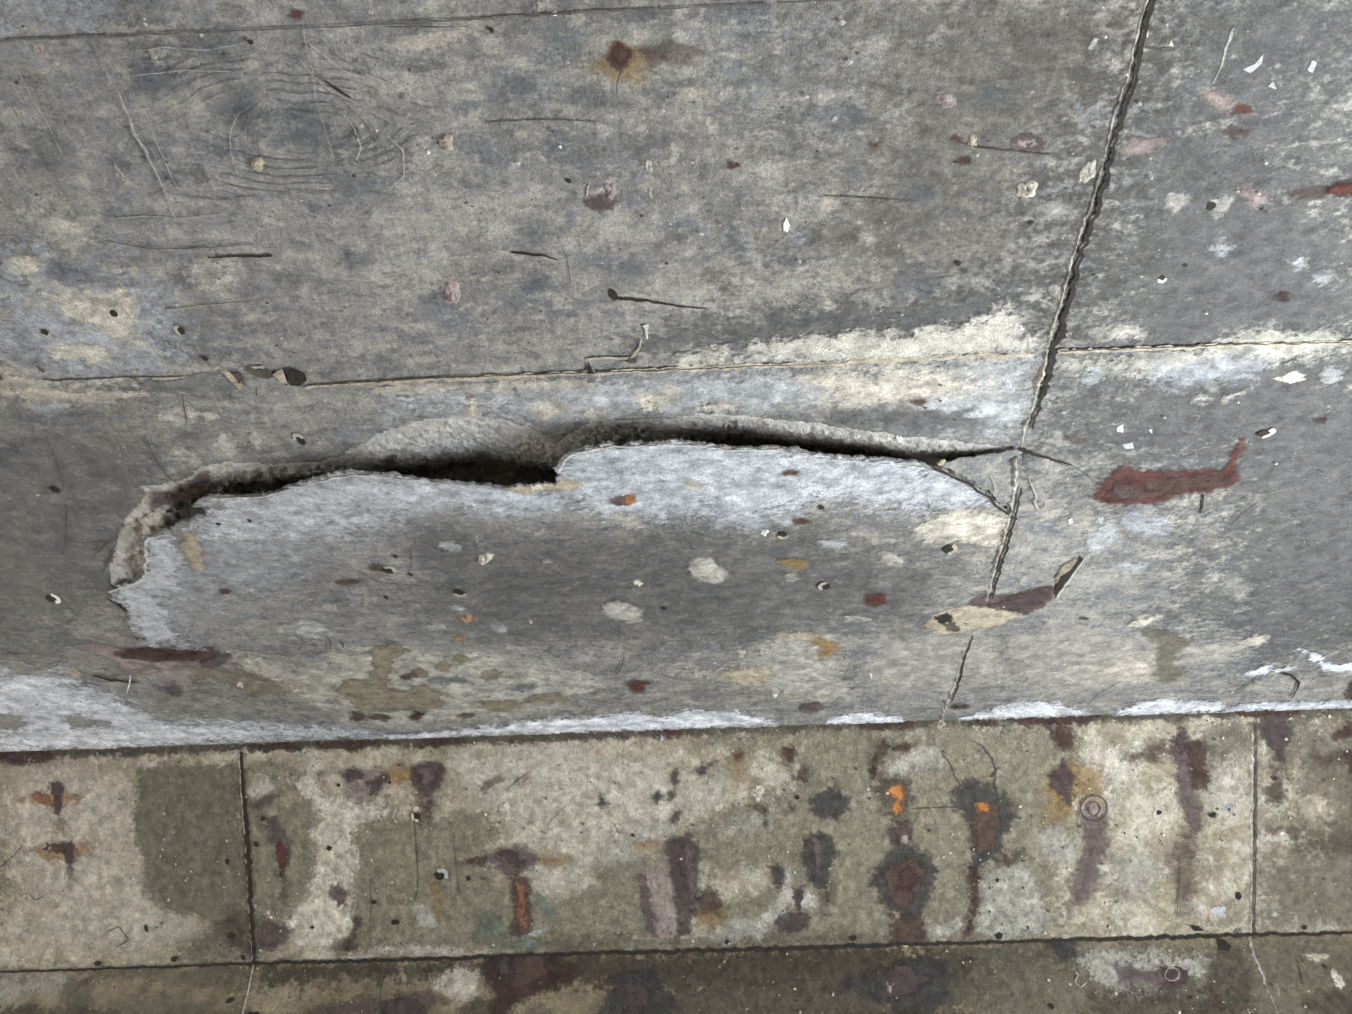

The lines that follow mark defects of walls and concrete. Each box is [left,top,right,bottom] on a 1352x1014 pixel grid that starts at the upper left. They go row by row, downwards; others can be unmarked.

crack [1018,0,1172,483]
spalling [108,413,1023,593]
crack [684,429,1023,599]
rust [1088,438,1247,507]
crack [1199,464,1243,514]
crack [952,636,973,701]
spalling [924,604,1022,635]
crack [1236,672,1335,703]
rust [631,833,728,943]
rust [859,721,939,946]
rust [951,778,1018,936]
rust [1125,726,1212,863]